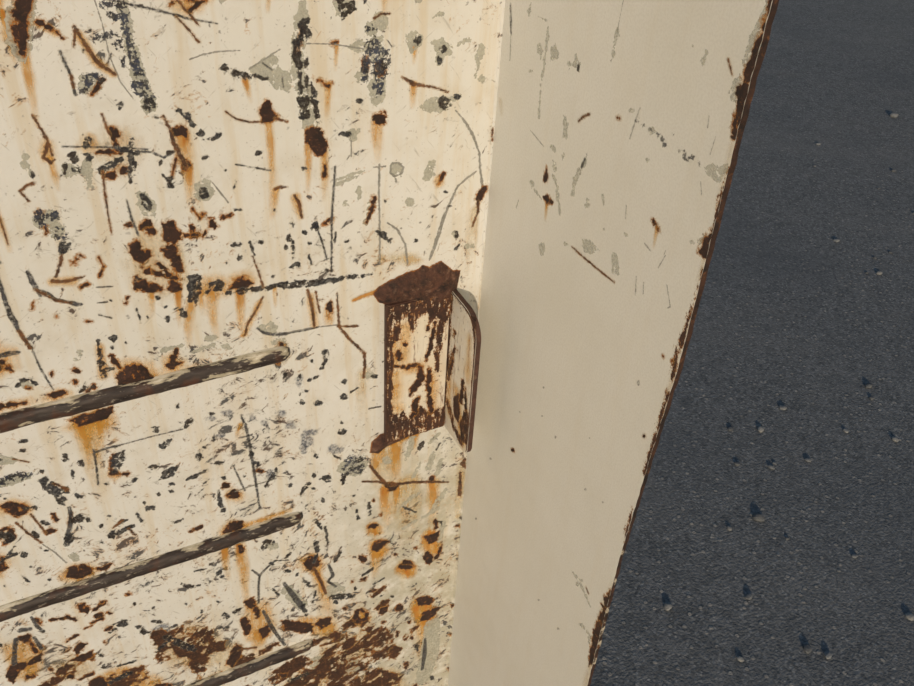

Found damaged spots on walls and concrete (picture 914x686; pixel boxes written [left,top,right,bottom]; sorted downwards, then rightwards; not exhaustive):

rust [0,0,65,87]
peeling [116,0,159,119]
peeling [219,0,318,130]
peeling [332,0,367,20]
peeling [348,11,390,107]
rust [95,113,193,233]
rust [225,100,288,166]
rust [123,200,244,322]
rust [373,293,477,469]
rust [0,501,112,579]
rust [358,513,443,578]
rust [0,577,454,686]